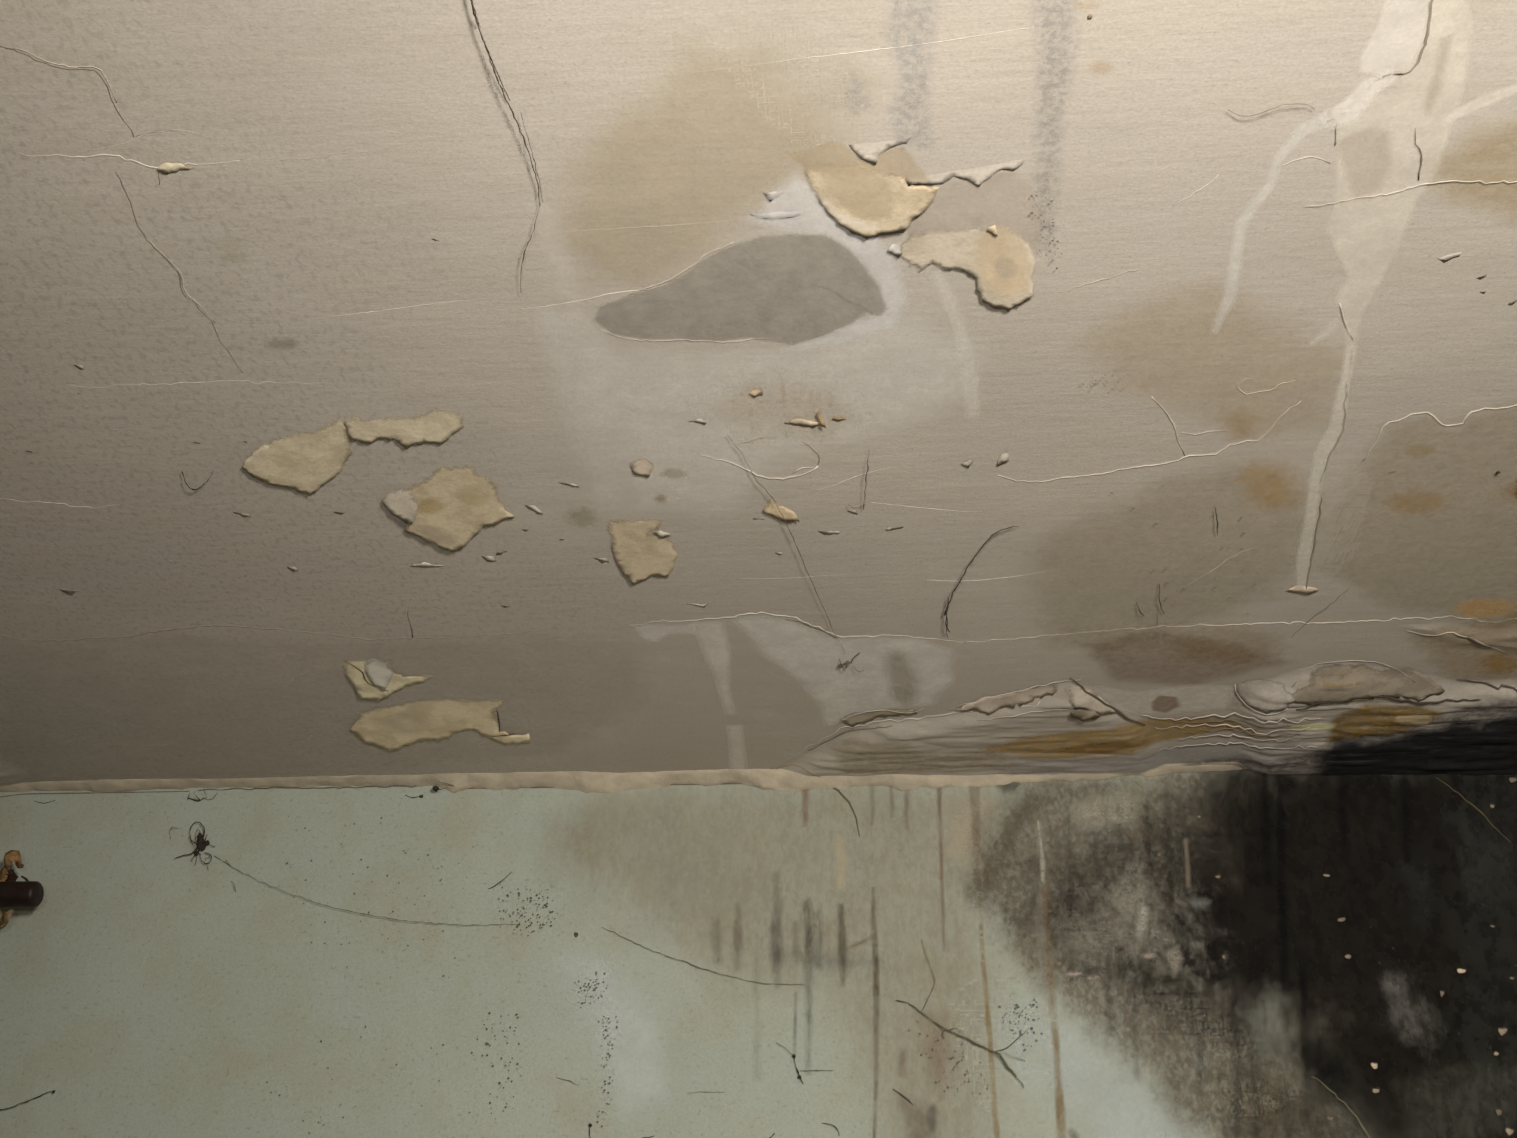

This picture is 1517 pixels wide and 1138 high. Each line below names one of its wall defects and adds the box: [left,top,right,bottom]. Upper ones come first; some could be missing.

crack [0,46,186,137]
damp [1030,0,1070,269]
crack [115,171,243,373]
flaking render [595,137,1042,346]
peeling [242,410,464,496]
peeling [382,467,515,568]
peeling [610,520,678,585]
damp [1328,409,1517,678]
peeling [344,659,531,751]
damp [888,652,917,705]
damp [574,696,1517,1138]